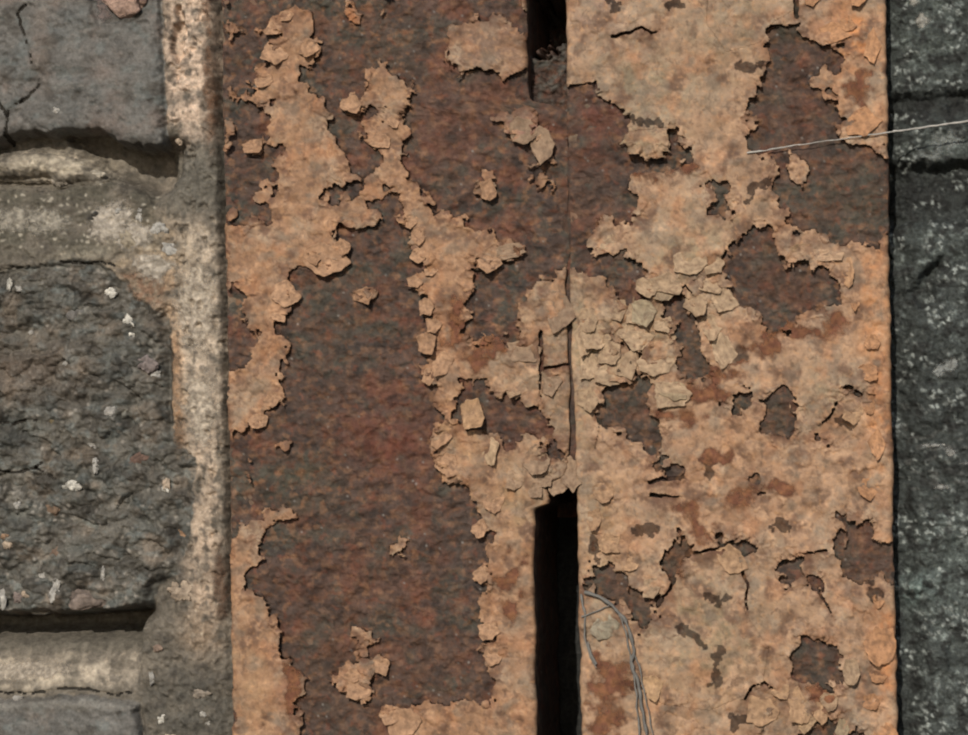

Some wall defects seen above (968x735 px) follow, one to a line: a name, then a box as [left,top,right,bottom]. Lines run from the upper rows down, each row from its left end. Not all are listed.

crack [792,0,800,19]
crack [611,26,657,38]
crack [0,4,40,147]
corrosion [204,0,898,735]
crack [0,686,132,697]